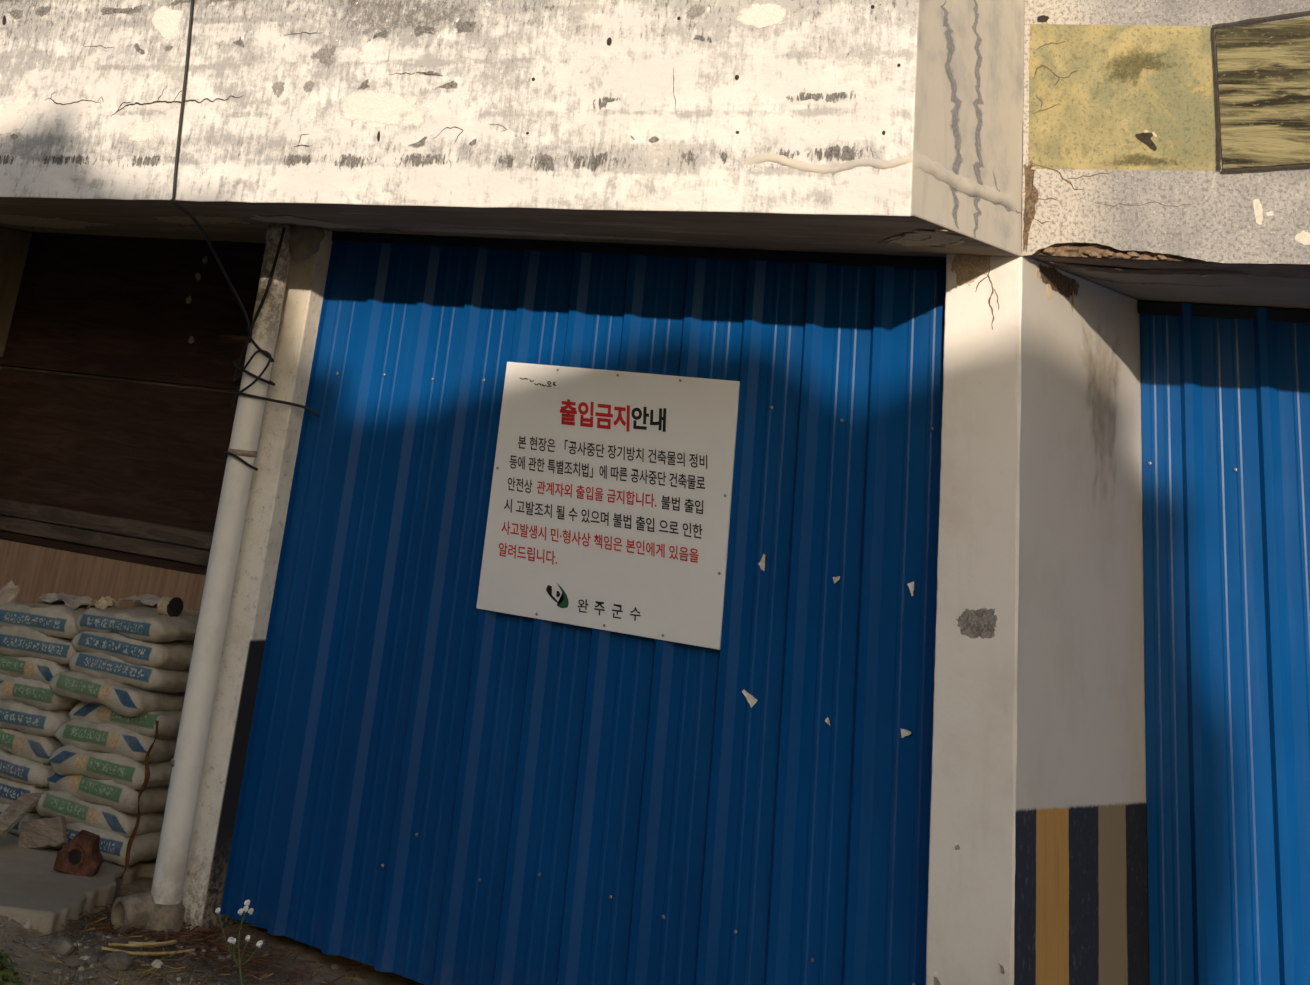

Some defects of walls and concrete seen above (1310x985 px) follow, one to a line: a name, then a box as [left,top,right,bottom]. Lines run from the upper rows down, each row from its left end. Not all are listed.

crack [44,88,244,116]
crack [877,0,1195,244]
flaking render [884,229,991,288]
spalling [1021,161,1248,312]
crack [975,266,999,330]